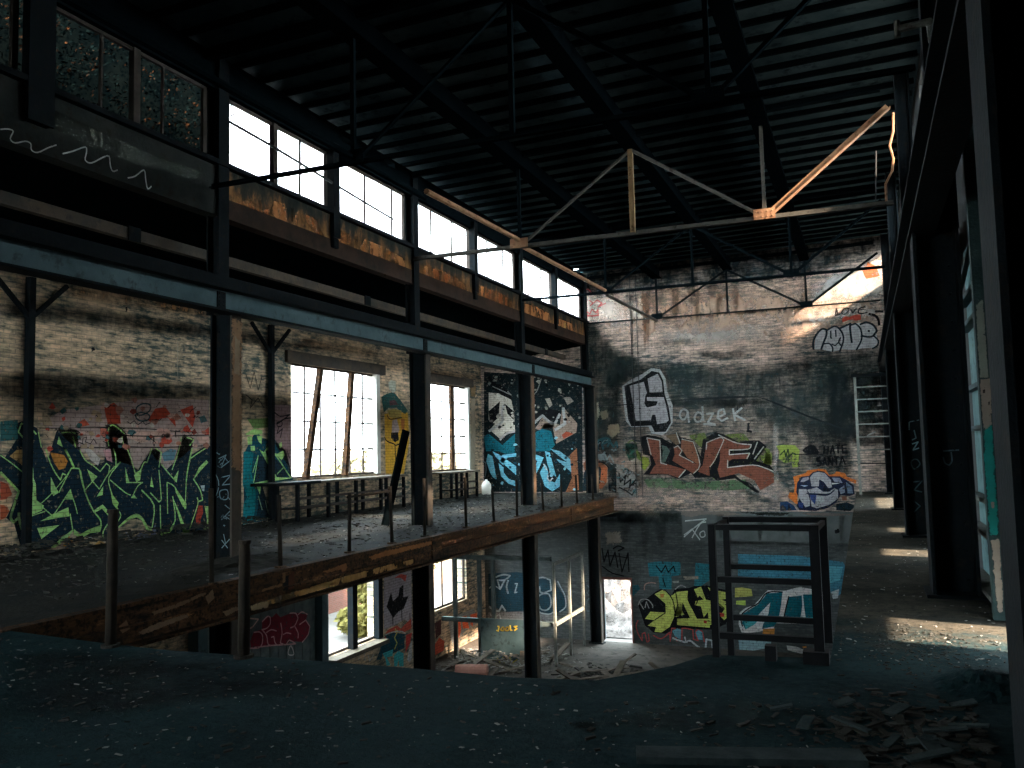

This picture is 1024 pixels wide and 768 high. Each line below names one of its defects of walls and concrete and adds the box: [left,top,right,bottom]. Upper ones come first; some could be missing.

corrosion [238,200,324,236]
corrosion [339,231,405,267]
corrosion [421,264,465,290]
corrosion [478,286,573,331]